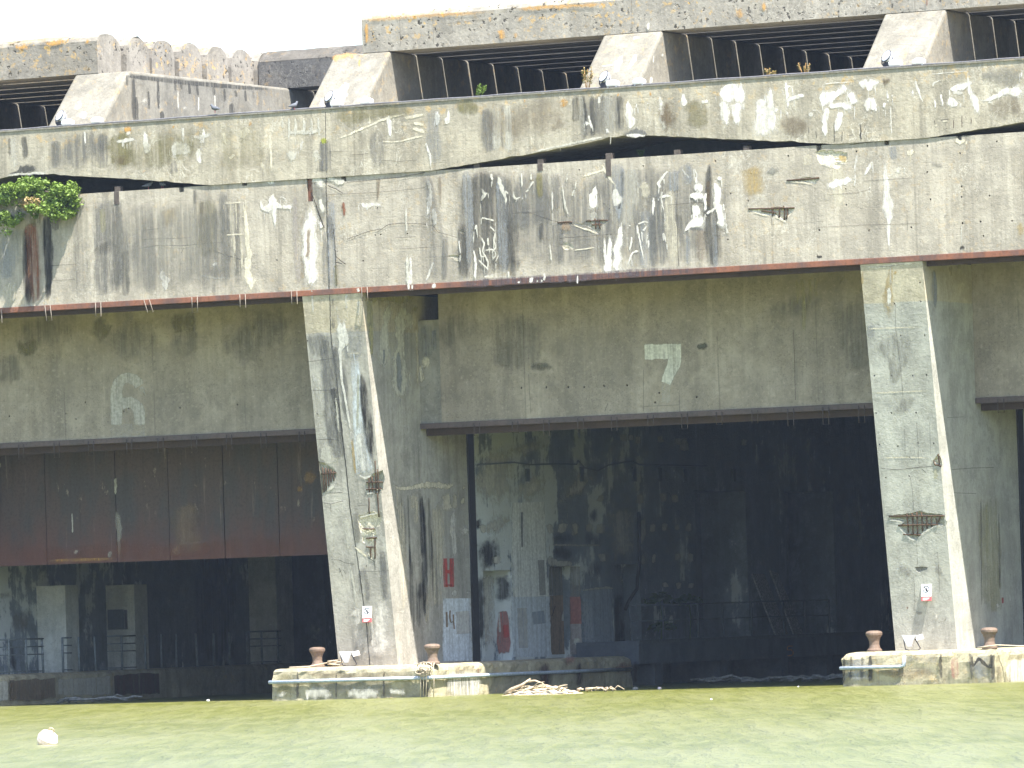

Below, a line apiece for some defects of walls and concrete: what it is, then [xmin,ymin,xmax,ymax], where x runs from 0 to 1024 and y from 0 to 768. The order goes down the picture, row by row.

water stain [641,166,691,265]
water stain [705,165,718,262]
spalling [748,206,795,222]
water stain [43,217,58,298]
water stain [320,174,576,473]
spalling [319,461,337,496]
spalling [358,461,385,560]
spalling [886,510,947,540]
water stain [498,578,509,600]